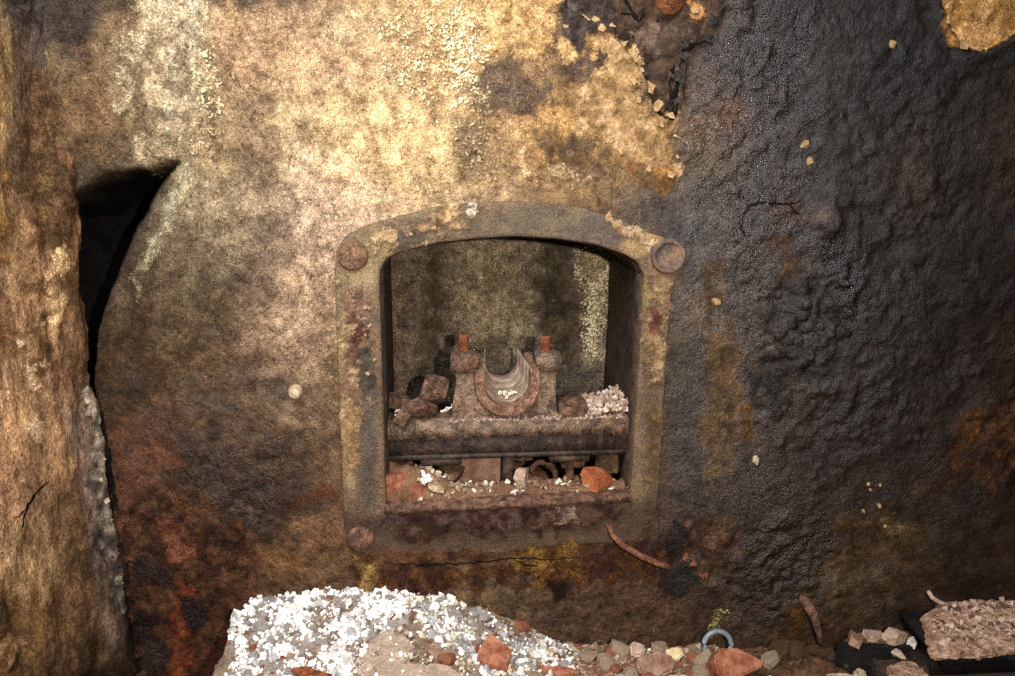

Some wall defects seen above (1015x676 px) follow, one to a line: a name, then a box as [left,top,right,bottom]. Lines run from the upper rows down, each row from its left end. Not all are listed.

peeling [477,0,720,197]
crack [14,481,50,529]
rust [111,474,253,676]
rust [528,459,558,479]
water stain [650,521,701,598]
water stain [816,503,932,581]